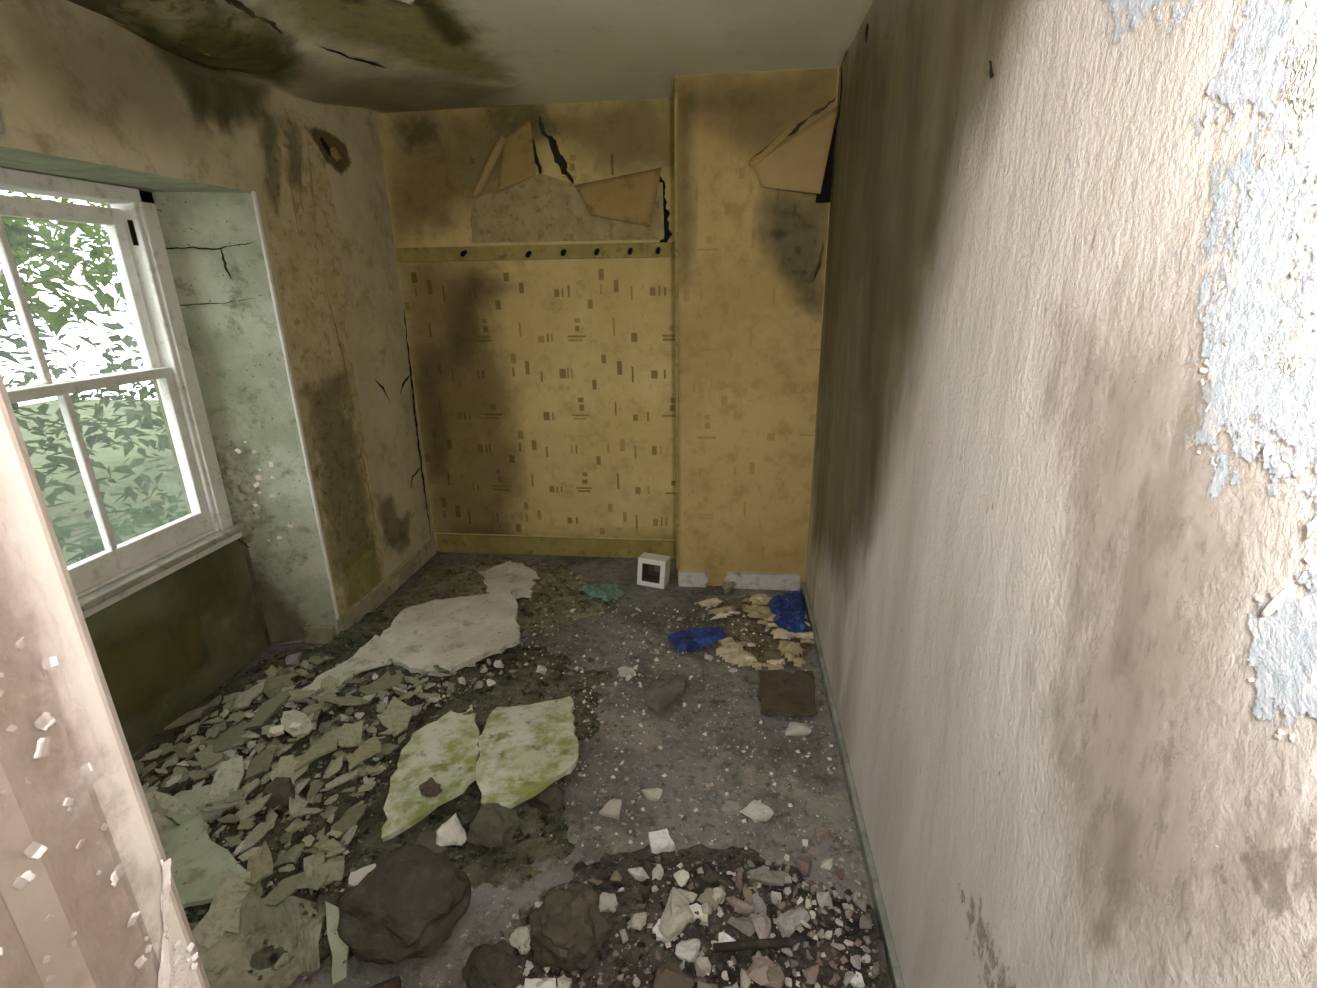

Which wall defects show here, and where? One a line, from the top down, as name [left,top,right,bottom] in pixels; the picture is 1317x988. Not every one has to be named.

leakage [138,22,294,121]
crack [225,0,285,34]
crack [319,46,386,68]
leakage [287,0,499,77]
crack [166,241,257,306]
leakage [769,0,1007,565]
peeling [1178,0,1317,540]
leakage [1063,356,1221,902]
peeling [1245,556,1317,742]
peeling [5,711,56,759]
peeling [11,841,48,891]
peeling [134,858,198,988]